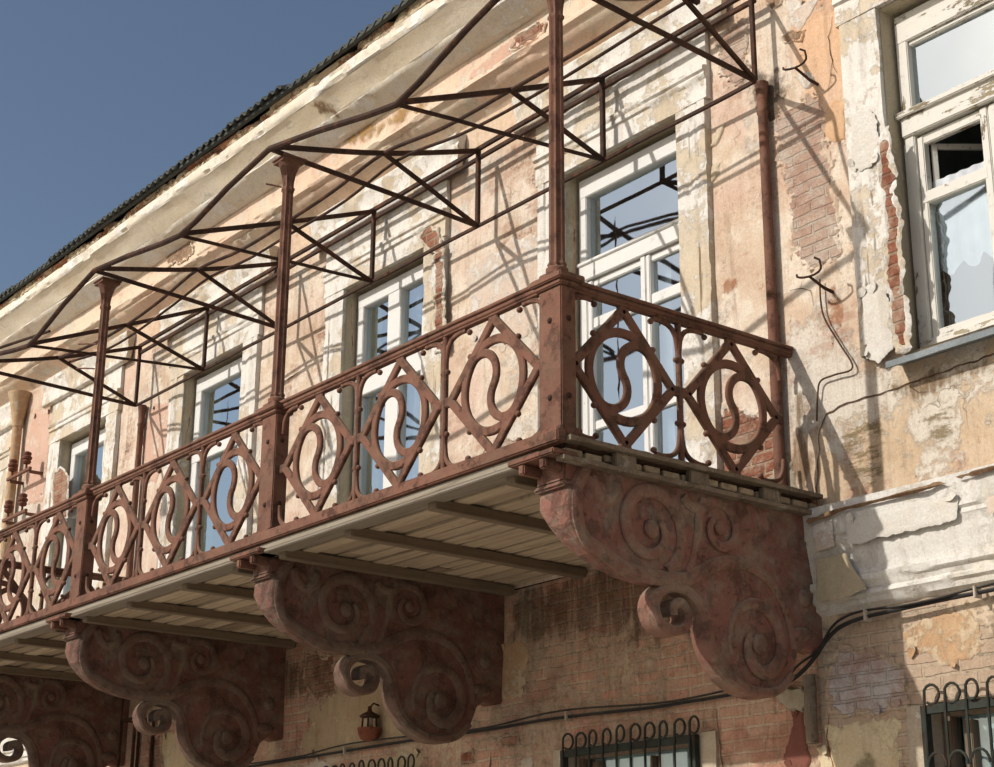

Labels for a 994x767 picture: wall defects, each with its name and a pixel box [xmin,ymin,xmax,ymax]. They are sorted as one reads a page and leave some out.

flaking render [469,20,547,79]
peeling [766,0,818,44]
flaking render [768,72,912,363]
spalling [420,226,446,330]
leakage [842,422,882,484]
spalling [956,465,994,479]
peeling [806,482,959,551]
peeling [824,644,910,719]